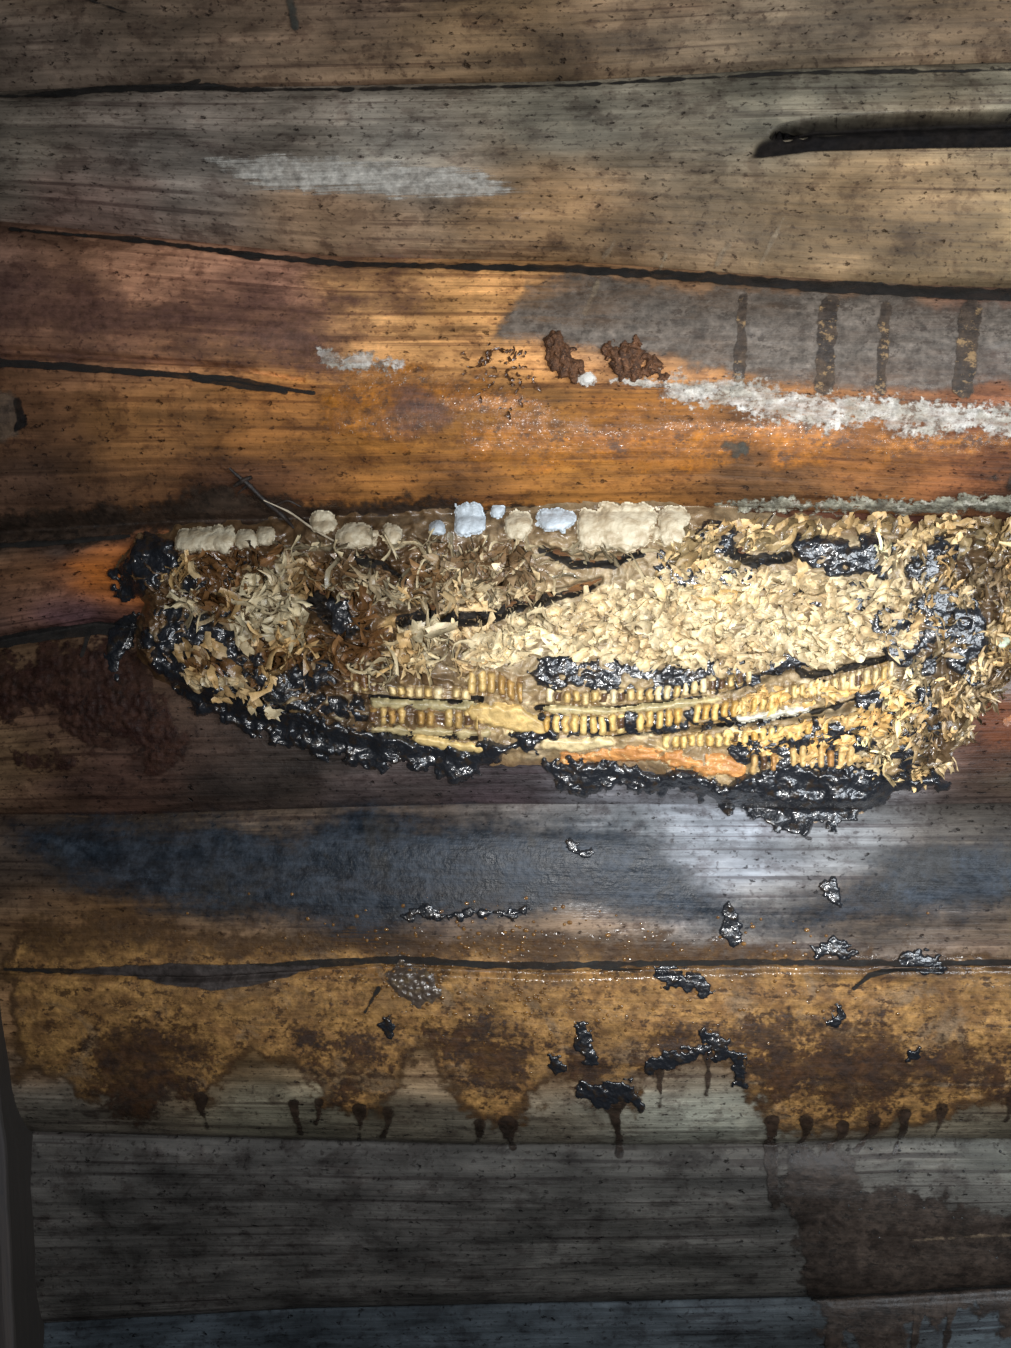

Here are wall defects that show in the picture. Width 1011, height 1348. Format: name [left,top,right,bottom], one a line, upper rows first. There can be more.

crack [0,68,1011,98]
crack [755,116,1011,158]
crack [0,358,315,432]
water stain [0,263,1011,471]
water stain [0,485,458,550]
water stain [714,476,1011,517]
water stain [2,910,1011,1348]